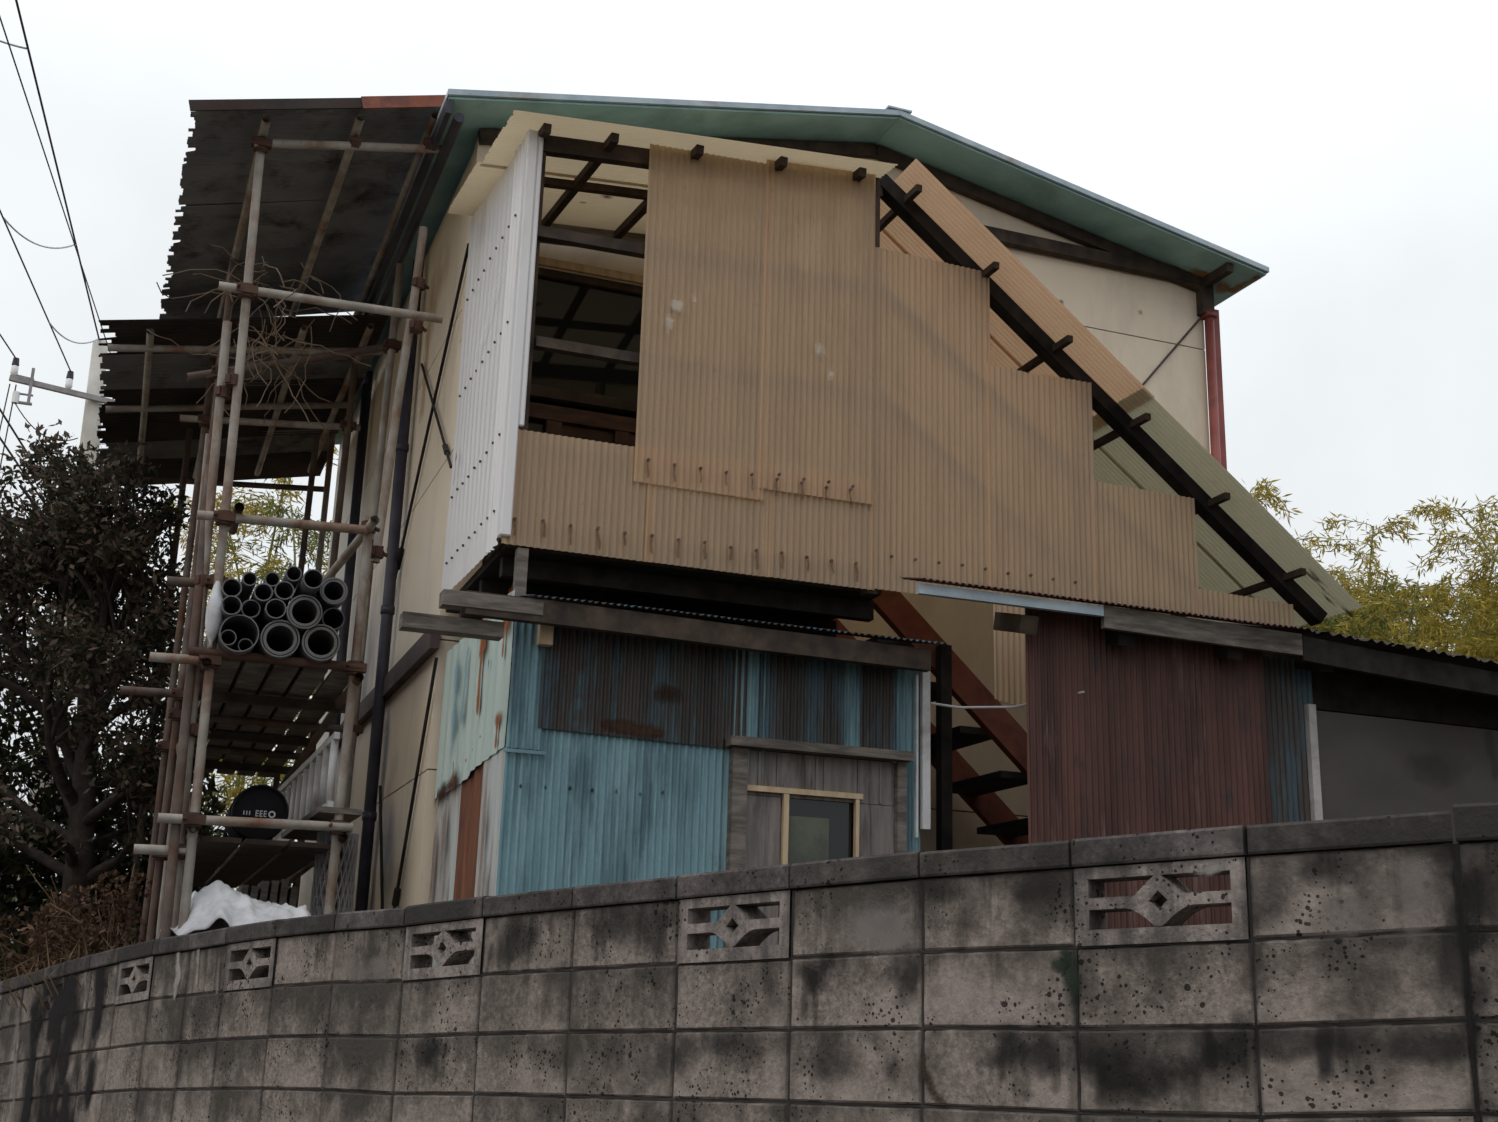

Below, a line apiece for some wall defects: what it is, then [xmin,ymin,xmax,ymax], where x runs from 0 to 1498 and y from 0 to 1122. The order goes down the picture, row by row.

corrosion [476,618,510,715]
damp [805,953,832,989]
damp [855,911,919,993]
damp [1060,947,1081,1005]
damp [11,994,41,1122]
damp [84,966,107,1106]
damp [992,1031,1055,1069]
damp [1083,1024,1350,1094]